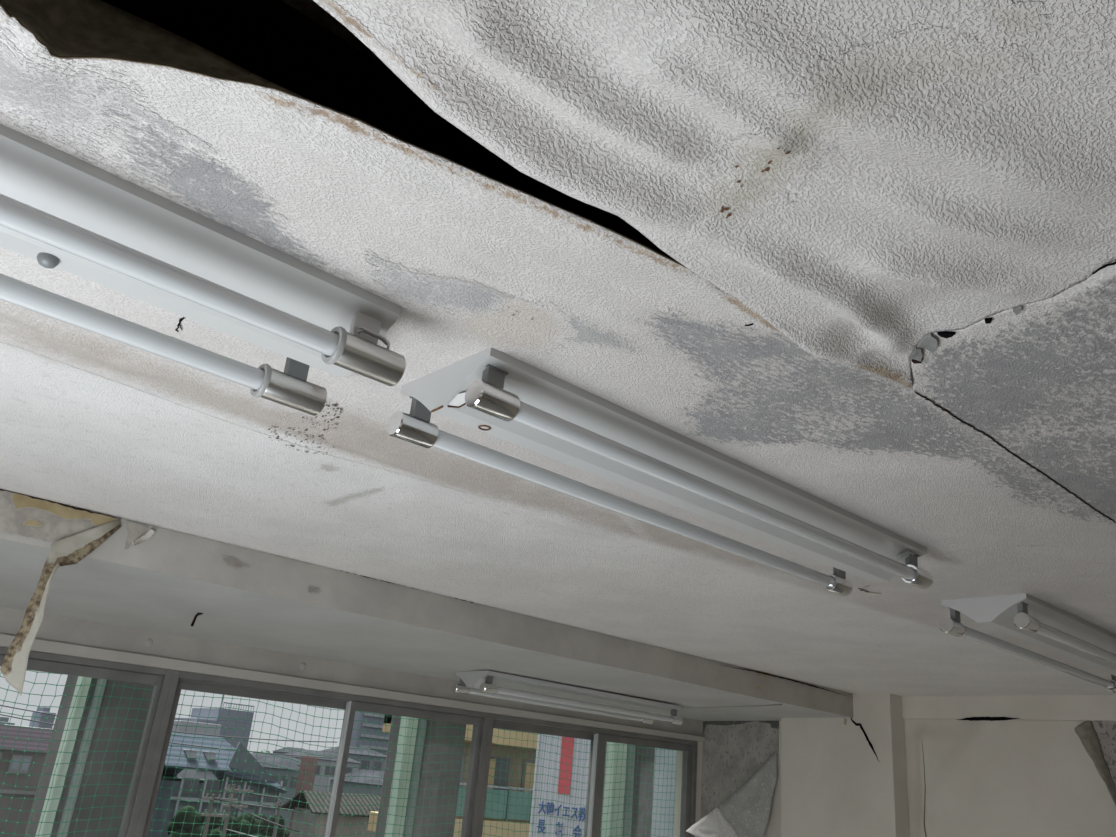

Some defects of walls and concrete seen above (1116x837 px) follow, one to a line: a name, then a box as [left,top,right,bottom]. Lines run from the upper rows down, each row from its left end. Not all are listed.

peeling [0,12,514,317]
crack [1092,261,1116,275]
crack [914,390,1116,523]
peeling [0,490,154,696]
flaking render [686,721,779,837]
crack [851,718,879,761]
flaking render [1092,721,1116,784]